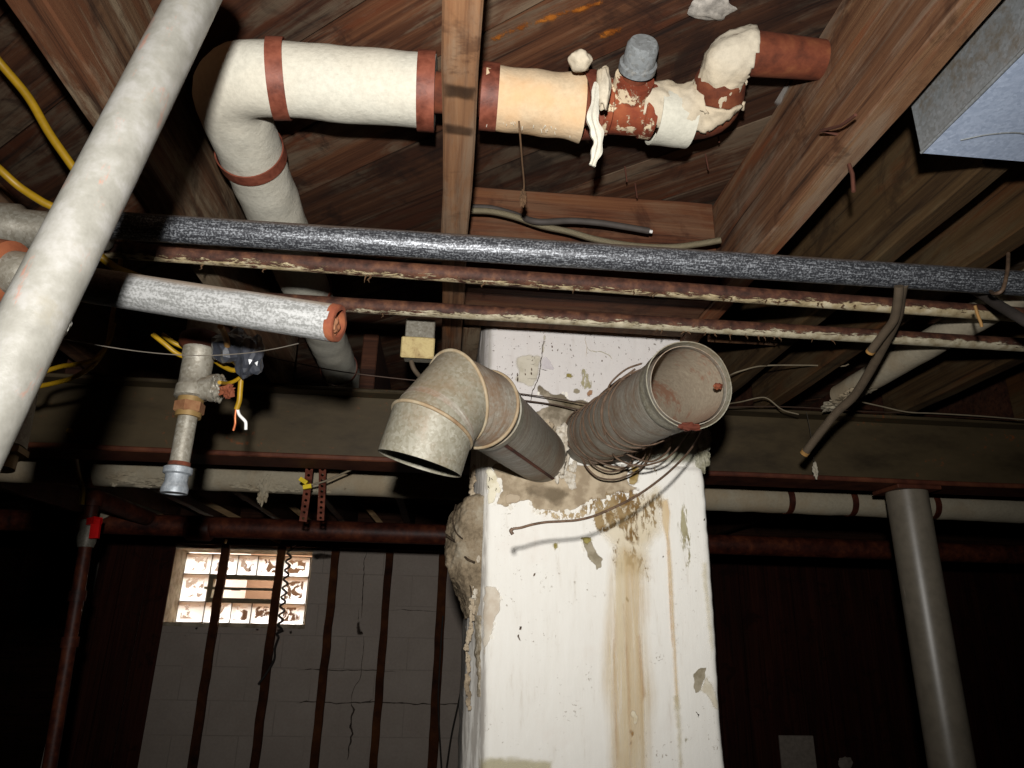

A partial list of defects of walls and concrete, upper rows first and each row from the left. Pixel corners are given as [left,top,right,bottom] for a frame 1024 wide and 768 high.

peeling [512,341,589,431]
peeling [492,464,636,516]
peeling [581,537,649,580]
water stain [582,490,659,572]
peeling [641,495,663,535]
crack [300,552,457,759]
spalling [463,587,502,711]
peeling [694,668,718,709]